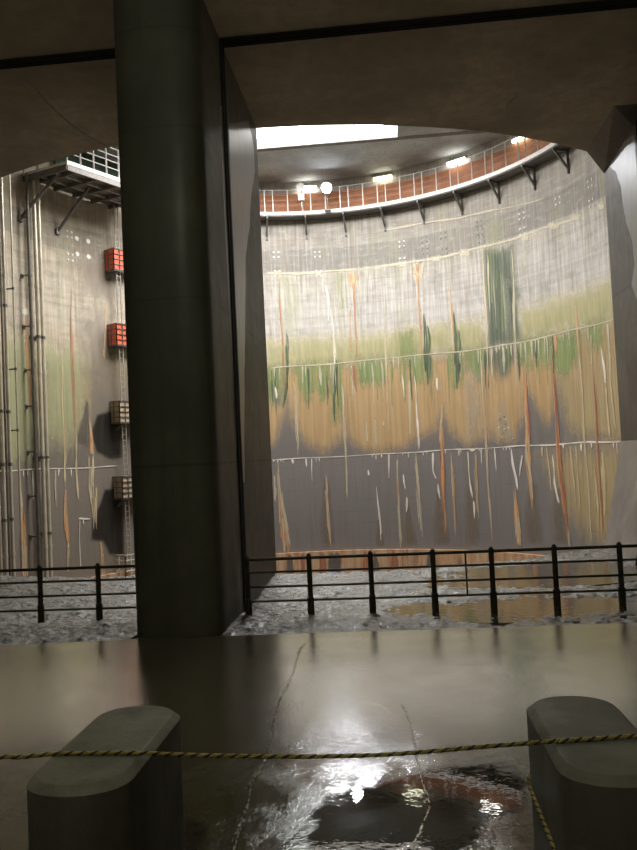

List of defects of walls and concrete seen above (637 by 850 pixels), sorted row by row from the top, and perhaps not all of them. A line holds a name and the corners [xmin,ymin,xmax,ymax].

damp [0,316,124,568]
rust [62,287,79,572]
rust [89,418,97,529]
damp [74,258,115,302]
rust [274,466,306,574]
damp [269,215,621,543]
rust [439,404,456,535]
rust [514,370,539,545]
rust [552,335,570,547]
crack [232,644,304,850]